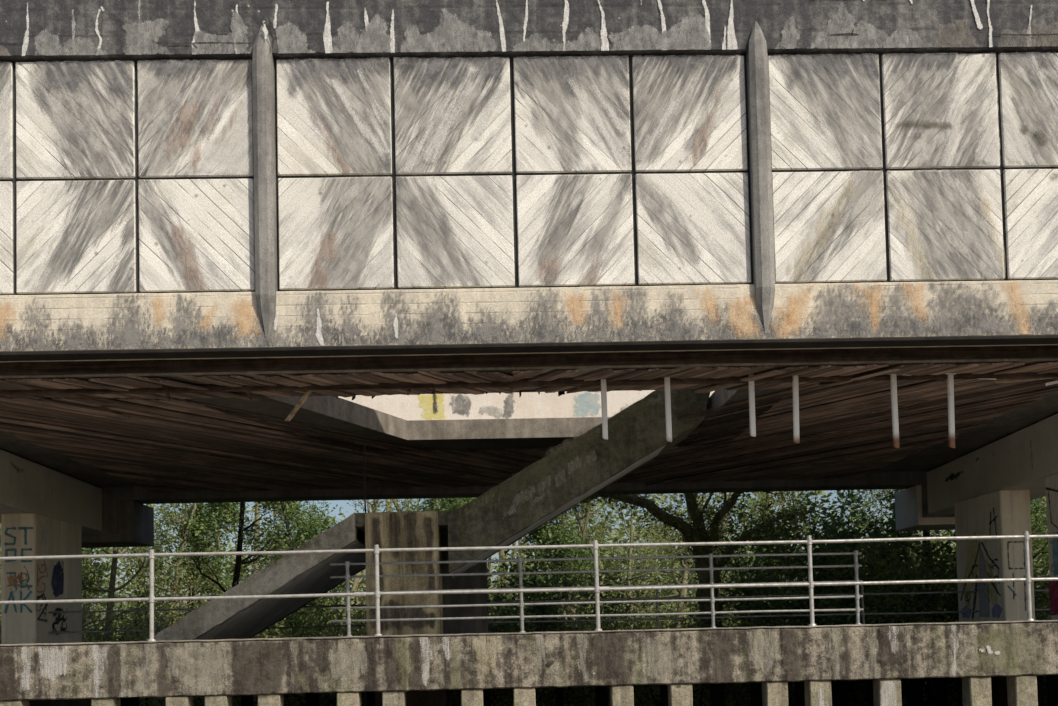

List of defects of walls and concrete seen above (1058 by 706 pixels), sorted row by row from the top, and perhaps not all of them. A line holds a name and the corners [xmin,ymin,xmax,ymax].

leakage [0,0,1058,351]
rust [729,298,758,337]
rust [1003,281,1029,334]
leakage [366,511,450,691]
leakage [0,646,69,700]
leakage [92,644,122,698]
leakage [157,643,171,696]
leakage [231,640,329,694]
leakage [842,627,852,679]